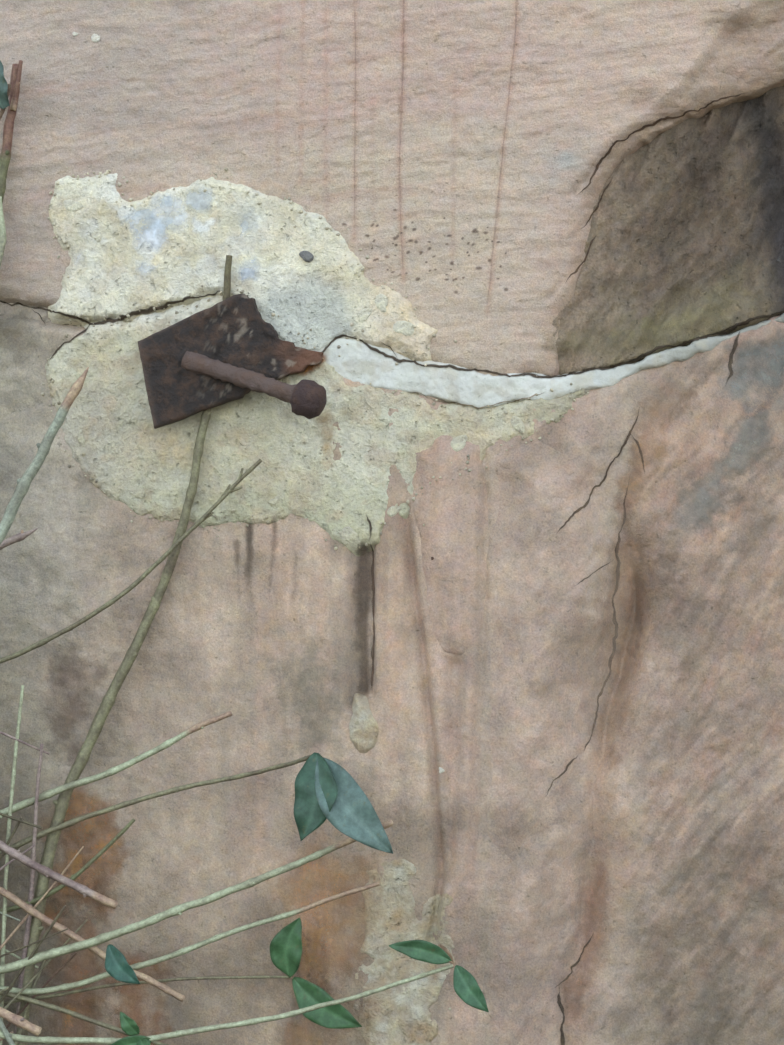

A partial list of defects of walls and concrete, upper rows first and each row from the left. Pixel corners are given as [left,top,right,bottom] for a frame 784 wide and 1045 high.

crack [0,291,218,361]
peeling [41,85,784,557]
crack [322,311,784,409]
water stain [235,524,252,570]
water stain [357,545,372,693]
crack [547,411,645,794]
crack [557,935,593,1045]